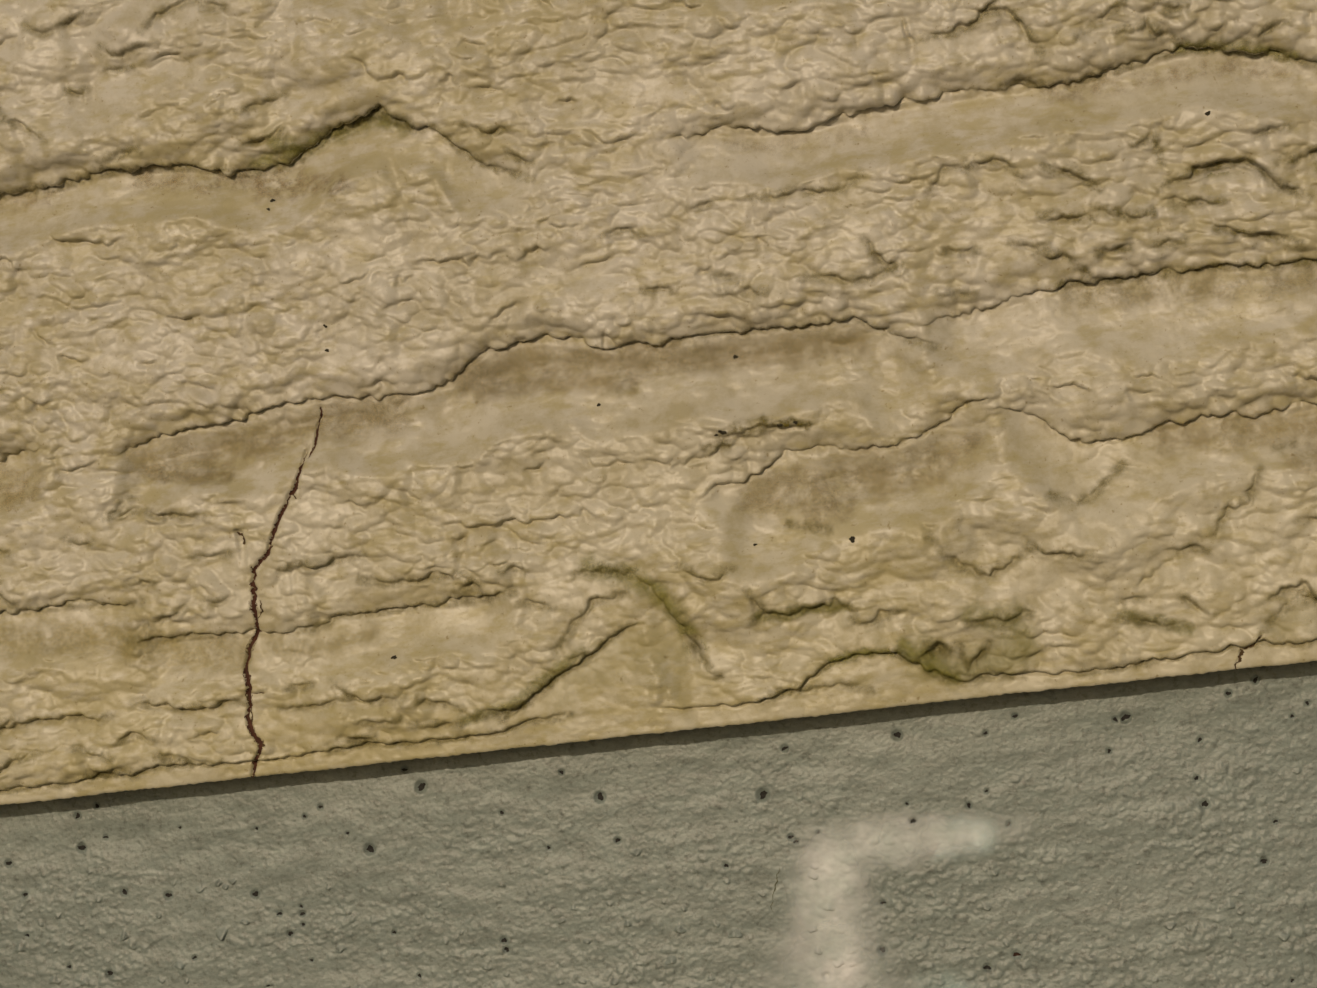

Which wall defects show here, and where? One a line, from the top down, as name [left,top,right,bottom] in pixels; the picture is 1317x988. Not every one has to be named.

crack [237,407,323,777]